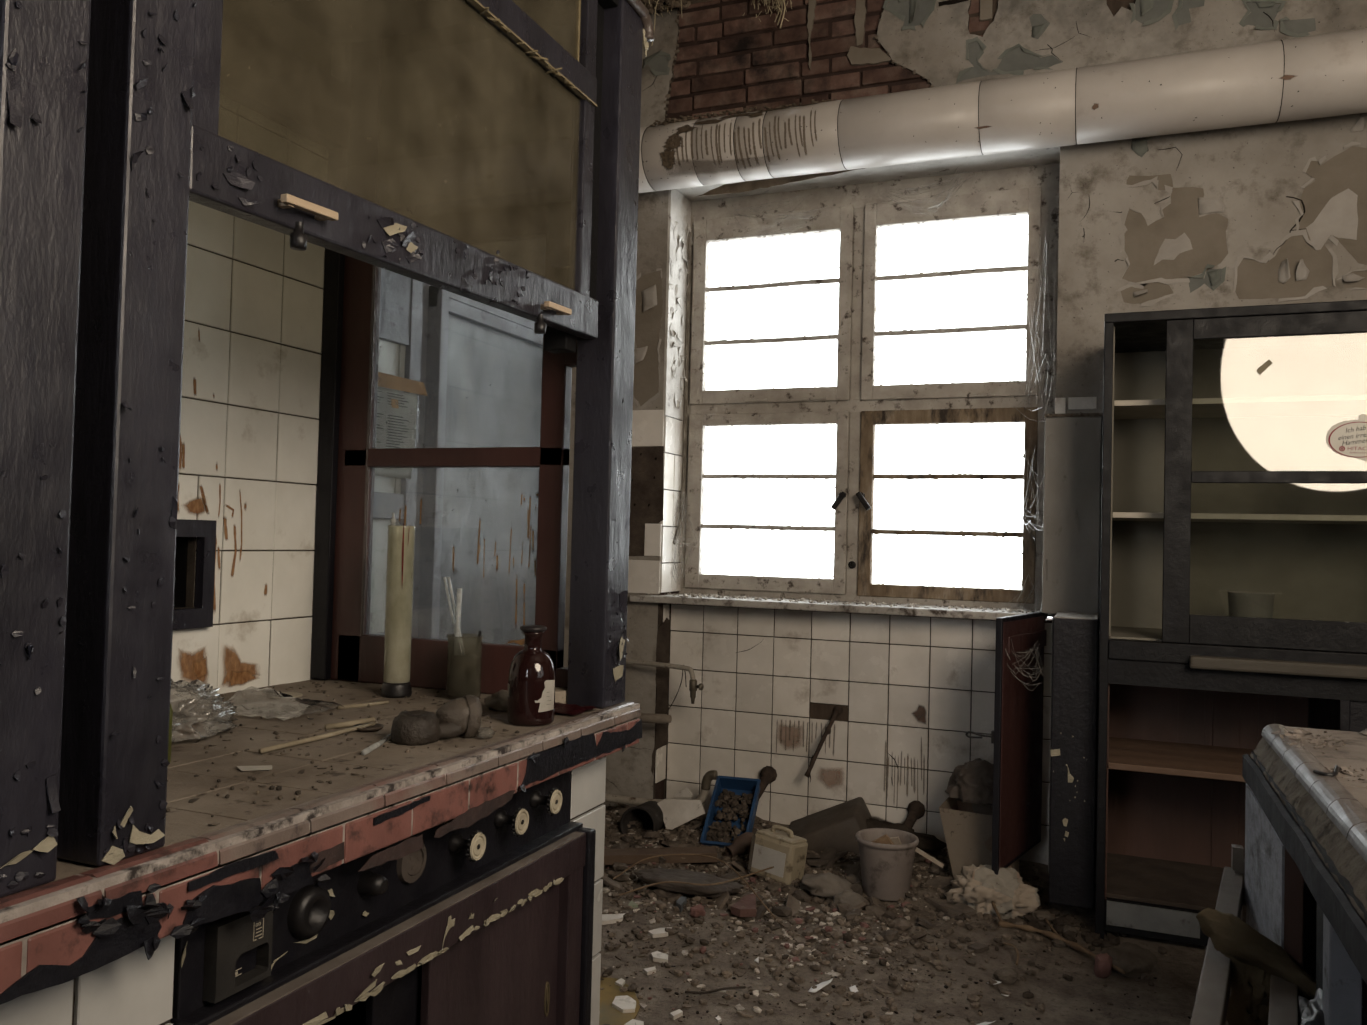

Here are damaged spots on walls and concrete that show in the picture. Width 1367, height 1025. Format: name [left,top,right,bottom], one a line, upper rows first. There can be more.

spalling [641,0,936,120]
peeling [956,0,1062,84]
peeling [1106,0,1205,30]
peeling [1239,0,1316,38]
peeling [1116,117,1367,307]
rust [178,435,246,610]
water stain [884,706,926,801]